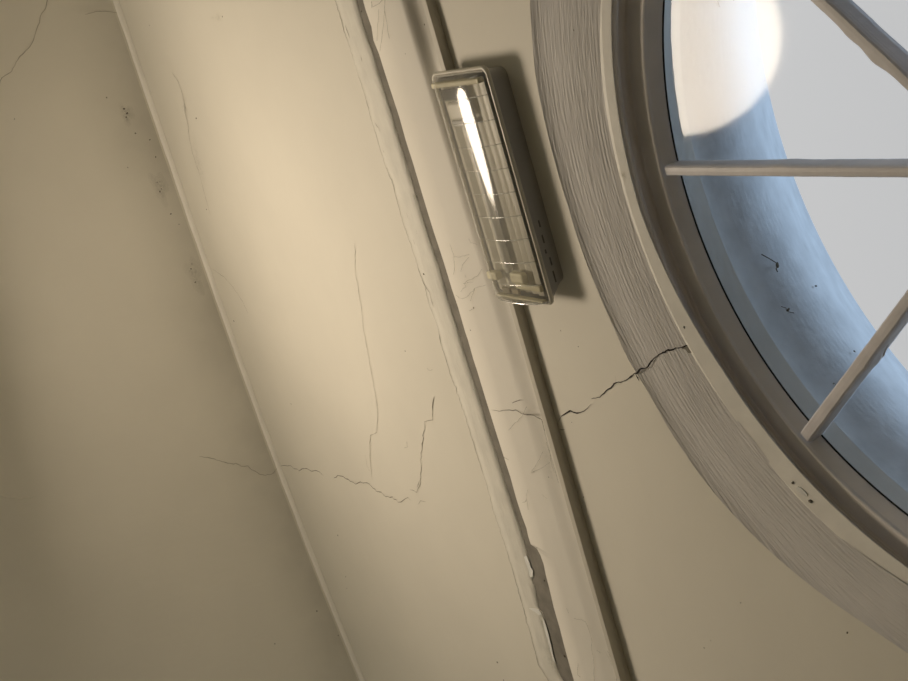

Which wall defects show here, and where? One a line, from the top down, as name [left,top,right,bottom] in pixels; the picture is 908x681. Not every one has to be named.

crack [200,275,434,502]
crack [495,345,687,432]